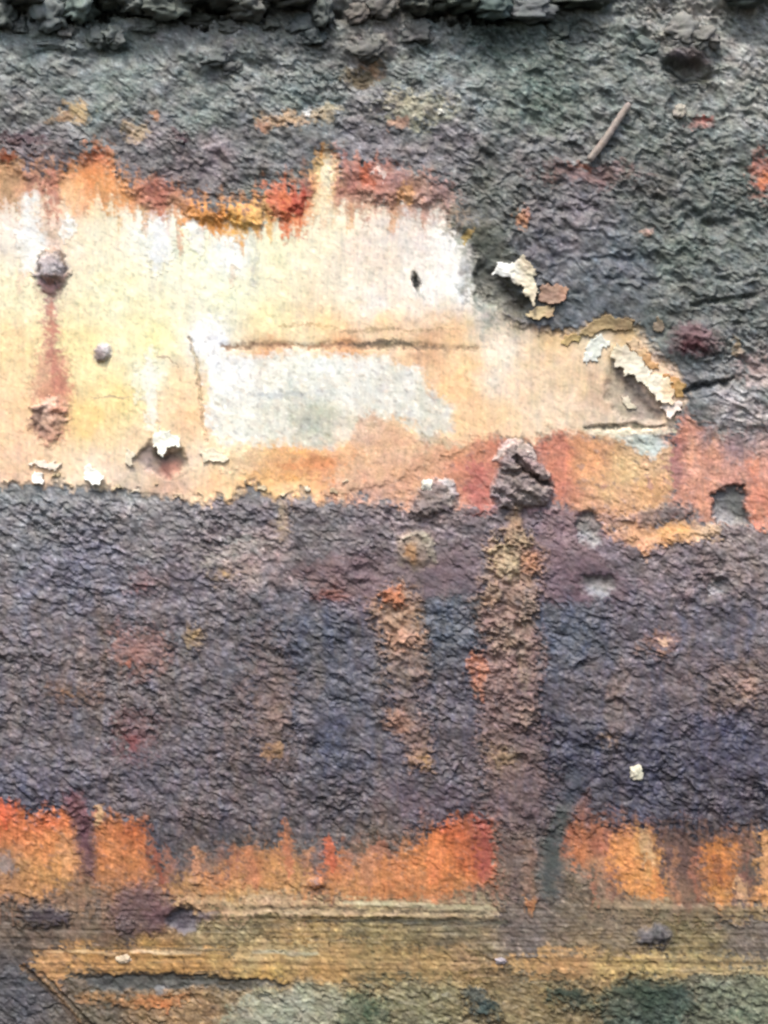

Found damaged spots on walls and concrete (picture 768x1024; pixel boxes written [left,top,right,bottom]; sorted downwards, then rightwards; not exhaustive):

corrosion [0,97,477,450]
peeling [0,194,693,510]
corrosion [0,406,768,952]
spalling [710,484,751,528]